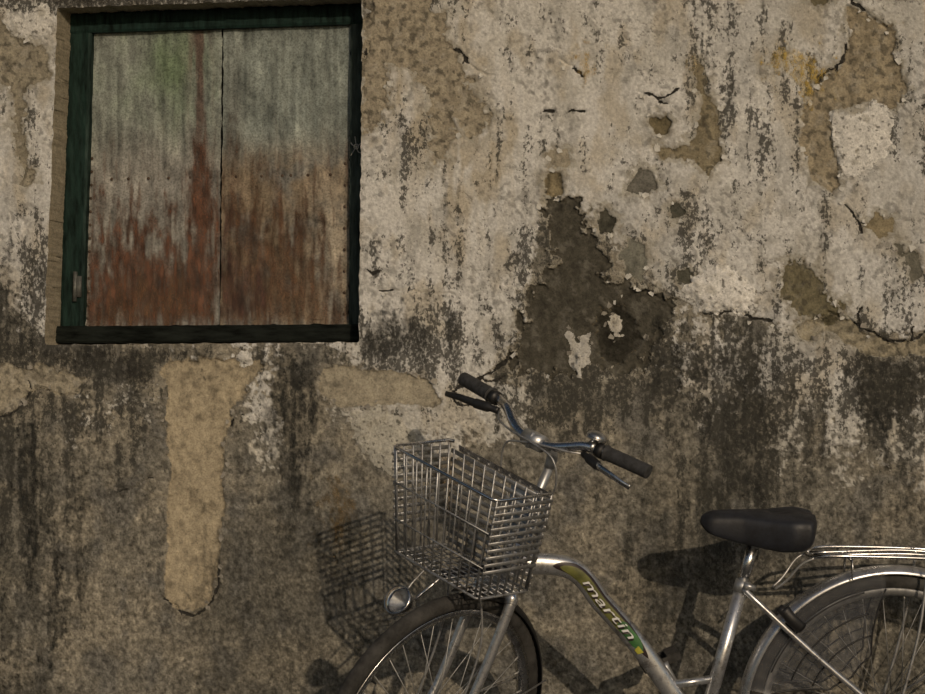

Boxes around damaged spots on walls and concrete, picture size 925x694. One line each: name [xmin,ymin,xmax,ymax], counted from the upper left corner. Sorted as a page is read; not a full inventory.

flaking render [647,63,727,180]
flaking render [799,6,907,192]
water stain [16,424,67,651]
corrosion [89,138,243,326]
flaking render [160,356,268,611]
water stain [264,353,323,509]
crack [452,351,514,407]
flaking render [507,148,677,385]
flaking render [677,265,694,287]
crack [703,309,775,327]
flaking render [780,260,925,357]
crack [853,306,925,345]